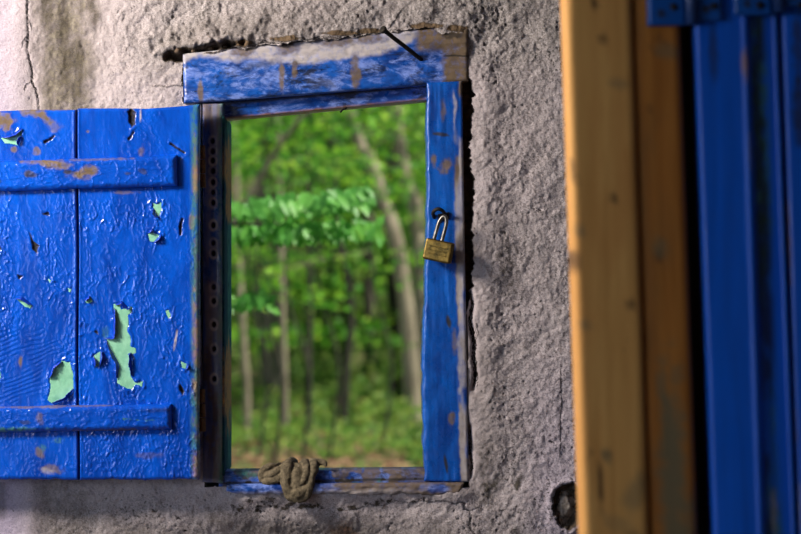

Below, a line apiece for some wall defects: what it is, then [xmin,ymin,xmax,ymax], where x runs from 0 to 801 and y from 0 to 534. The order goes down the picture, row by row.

crack [21,0,40,106]
water stain [43,0,89,110]
spalling [162,28,379,63]
spalling [410,22,468,32]
peeling [1,129,22,146]
peeling [152,202,162,218]
peeling [148,229,161,242]
peeling [92,301,143,389]
peeling [47,360,74,404]
spalling [552,482,578,531]